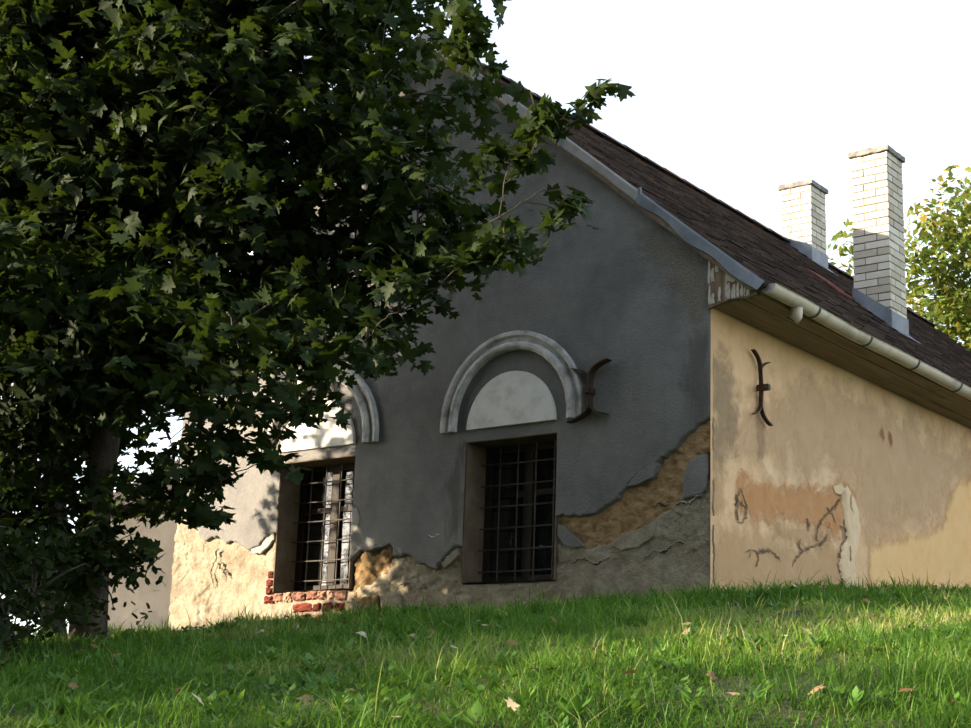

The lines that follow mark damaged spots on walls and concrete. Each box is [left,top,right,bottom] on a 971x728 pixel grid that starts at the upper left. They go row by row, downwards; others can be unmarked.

flaking render [168,417,715,631]
crack [736,488,748,524]
crack [745,495,846,572]
leakage [713,359,971,541]